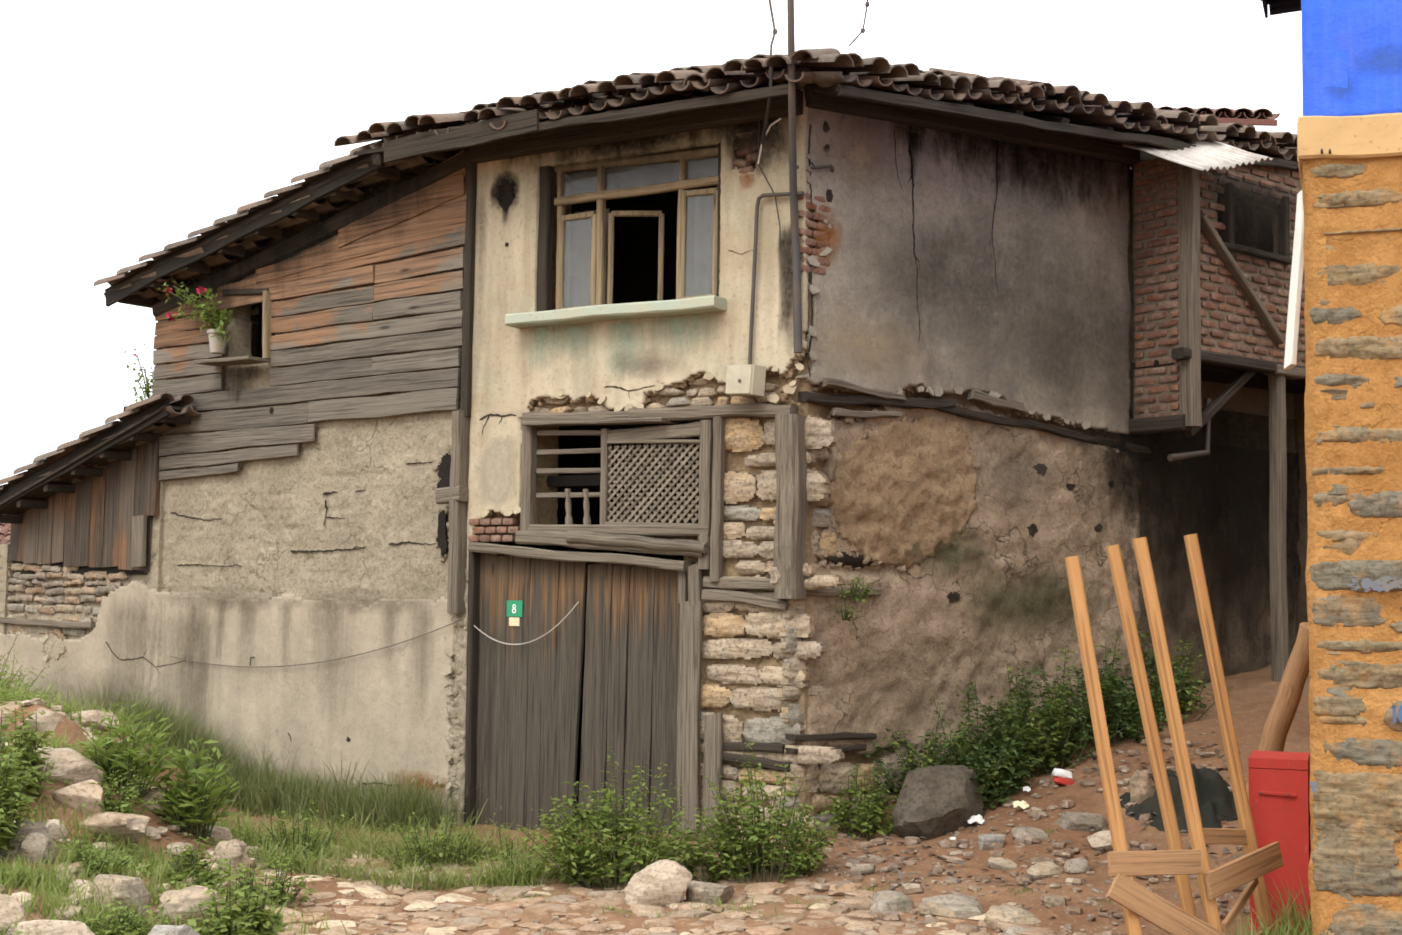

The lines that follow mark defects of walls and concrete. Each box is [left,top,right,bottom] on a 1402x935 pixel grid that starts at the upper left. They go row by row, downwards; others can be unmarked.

spalling [797,121,835,202]
crack [894,129,921,343]
spalling [766,211,1104,437]
spalling [516,372,727,417]
spalling [432,449,451,488]
spalling [435,505,449,588]
spalling [482,507,521,518]
spalling [401,569,468,825]